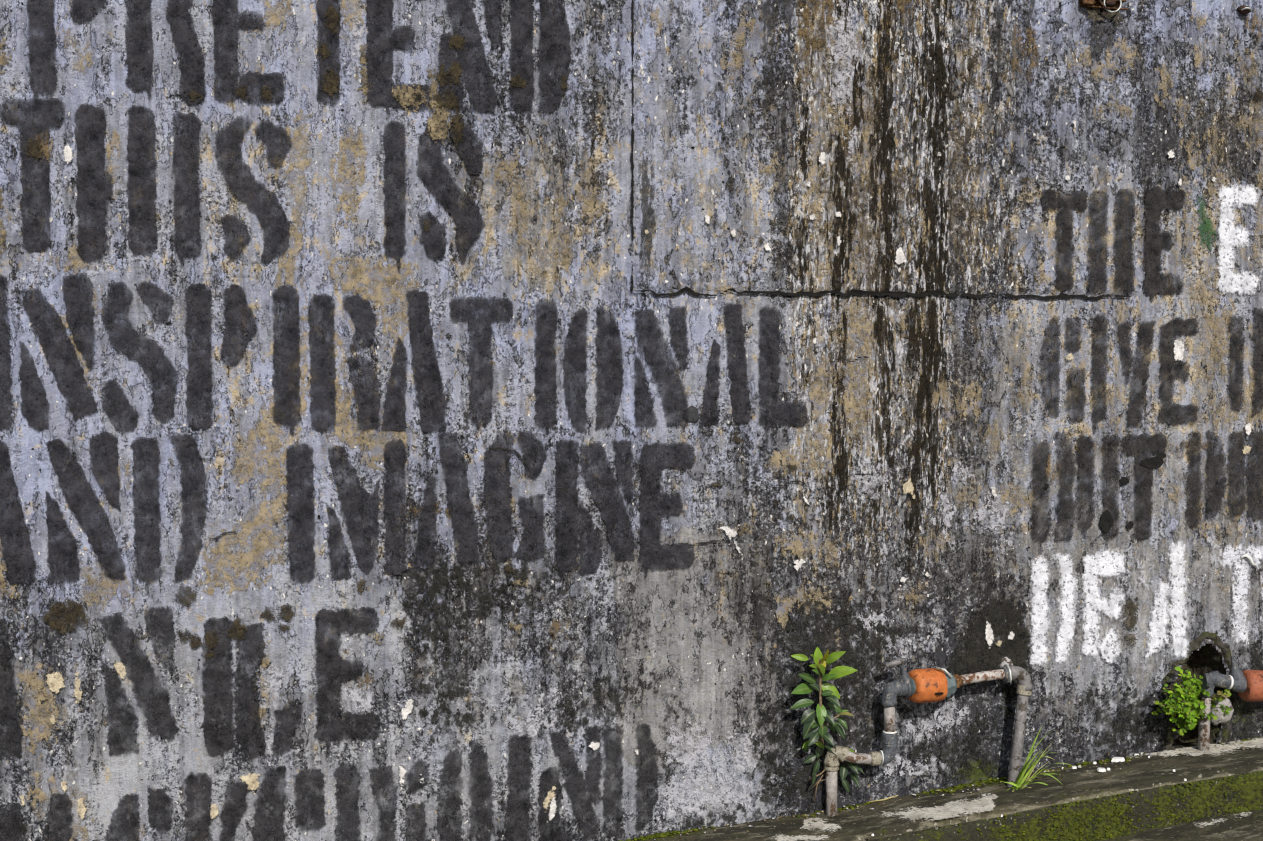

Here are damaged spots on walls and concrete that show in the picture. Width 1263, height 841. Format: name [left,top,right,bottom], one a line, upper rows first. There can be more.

peeling [0,38,11,75]
leakage [758,0,796,120]
leakage [799,106,810,182]
crack [630,0,1132,300]
leakage [639,157,656,268]
leakage [794,215,809,291]
leakage [824,0,976,574]
leakage [974,493,1013,552]
leakage [336,674,374,714]
leakage [369,544,560,748]
leakage [509,585,1034,841]
spalling [1161,632,1237,750]